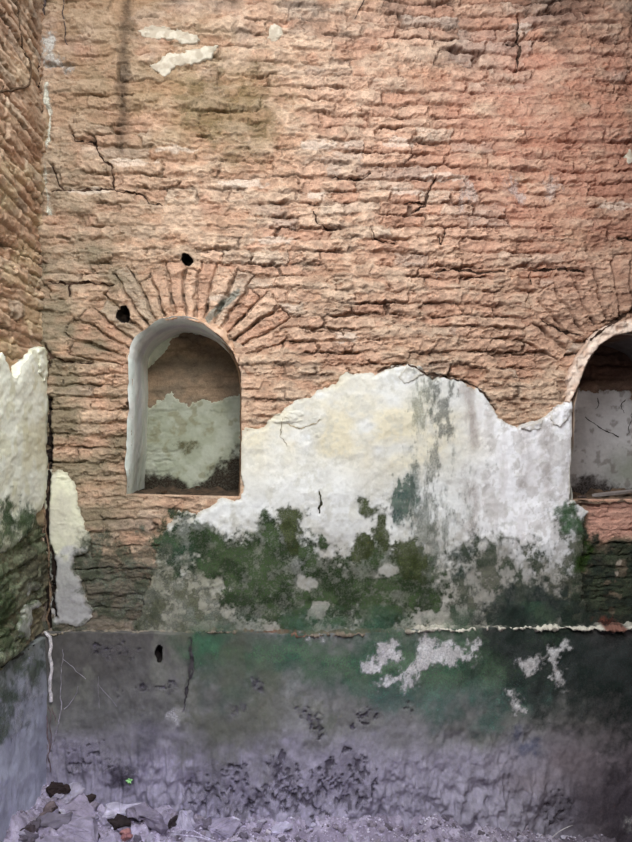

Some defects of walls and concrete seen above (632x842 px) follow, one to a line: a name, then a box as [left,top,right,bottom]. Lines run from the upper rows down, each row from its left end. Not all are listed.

crack [505,19,522,73]
crack [51,134,163,206]
peeling [148,333,181,368]
crack [542,308,632,341]
damp [71,531,235,632]
damp [276,505,303,555]
peeling [137,364,632,632]
damp [351,497,430,585]
damp [444,502,593,626]
crack [182,639,194,712]
damp [361,633,482,691]
damp [519,640,571,684]